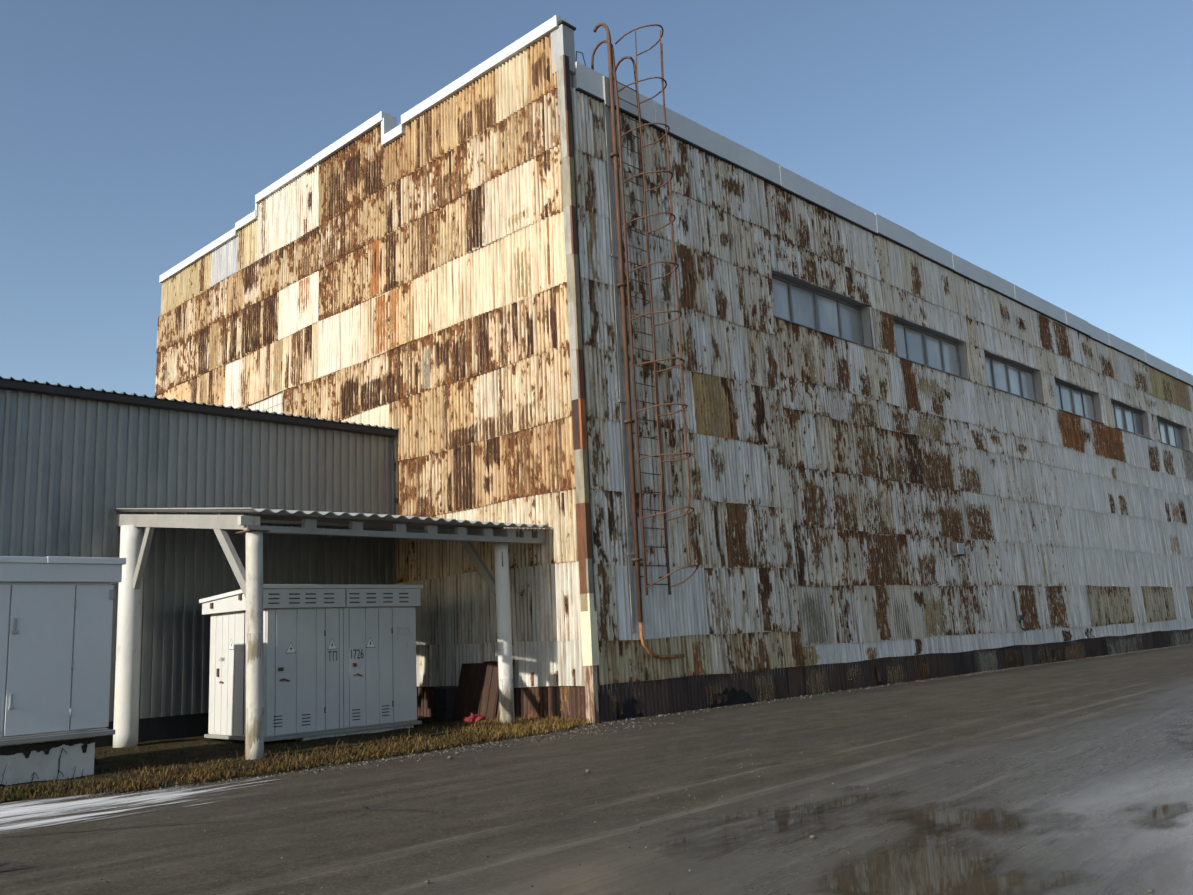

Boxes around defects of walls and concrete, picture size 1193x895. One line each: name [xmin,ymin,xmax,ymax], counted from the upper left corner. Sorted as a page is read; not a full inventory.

corrosion [162,141,397,406]
corrosion [340,179,418,420]
corrosion [416,91,496,274]
corrosion [436,203,565,517]
corrosion [526,54,556,176]
corrosion [590,433,632,640]
corrosion [651,148,745,319]
corrosion [682,323,820,675]
corrosion [780,203,994,659]
corrosion [999,304,1114,378]
corrosion [1057,410,1126,480]
leakage [0,737,95,758]